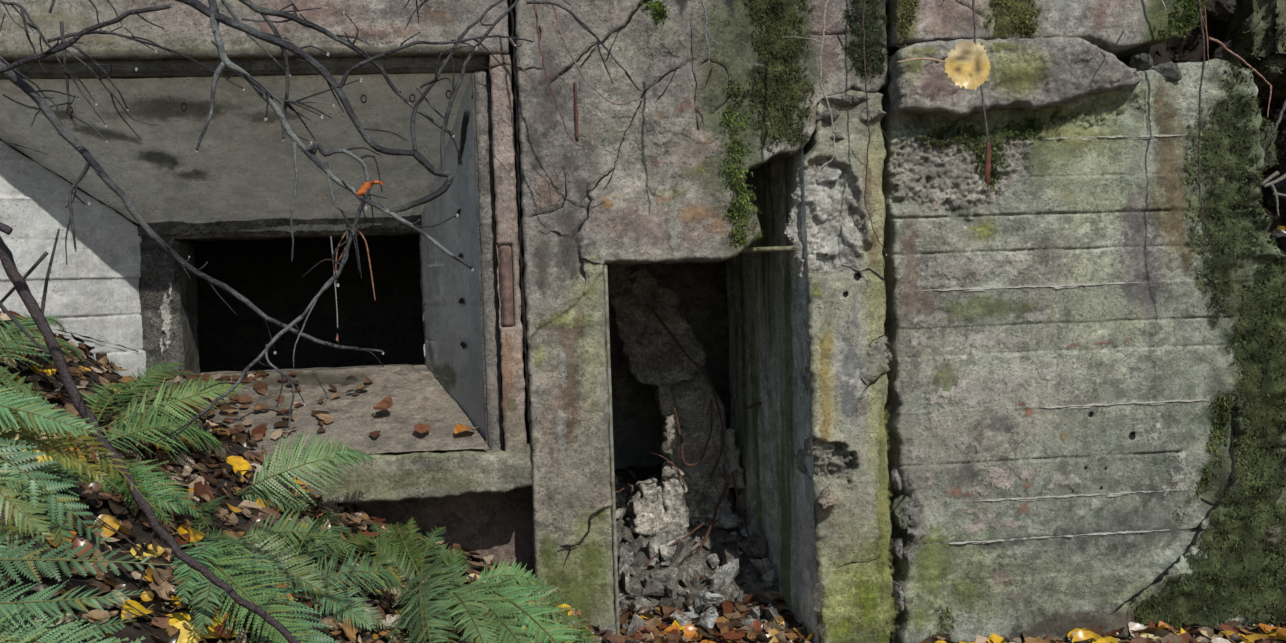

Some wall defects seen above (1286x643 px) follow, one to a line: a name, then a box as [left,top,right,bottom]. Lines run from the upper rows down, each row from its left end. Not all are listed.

crack [483,0,744,461]
spalling [784,163,869,277]
spalling [808,441,854,481]
crack [560,506,609,570]
crack [1106,423,1237,617]